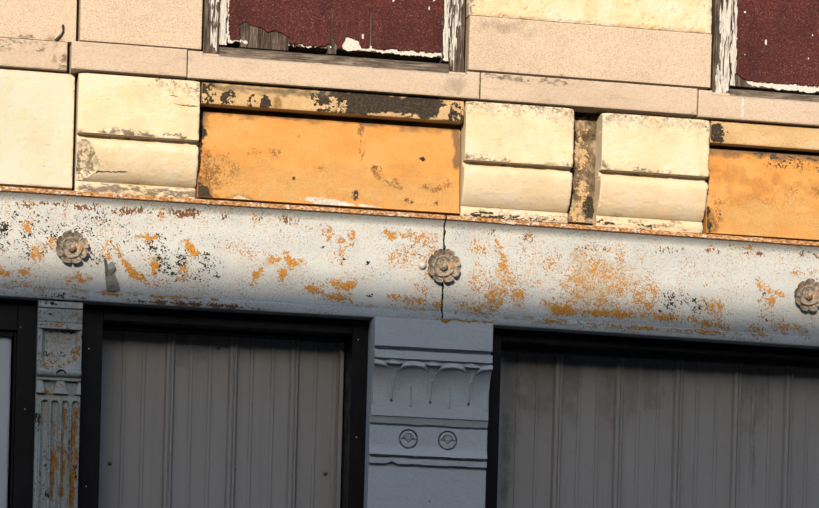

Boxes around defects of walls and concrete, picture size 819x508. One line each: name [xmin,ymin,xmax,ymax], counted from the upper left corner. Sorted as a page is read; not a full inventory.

peeling [209,0,248,51]
peeling [715,0,746,93]
peeling [202,82,464,122]
peeling [746,80,819,93]
spalling [198,113,238,205]
water stain [464,128,615,226]
peeling [0,208,228,284]
crack [441,215,449,255]
peeling [658,288,712,322]